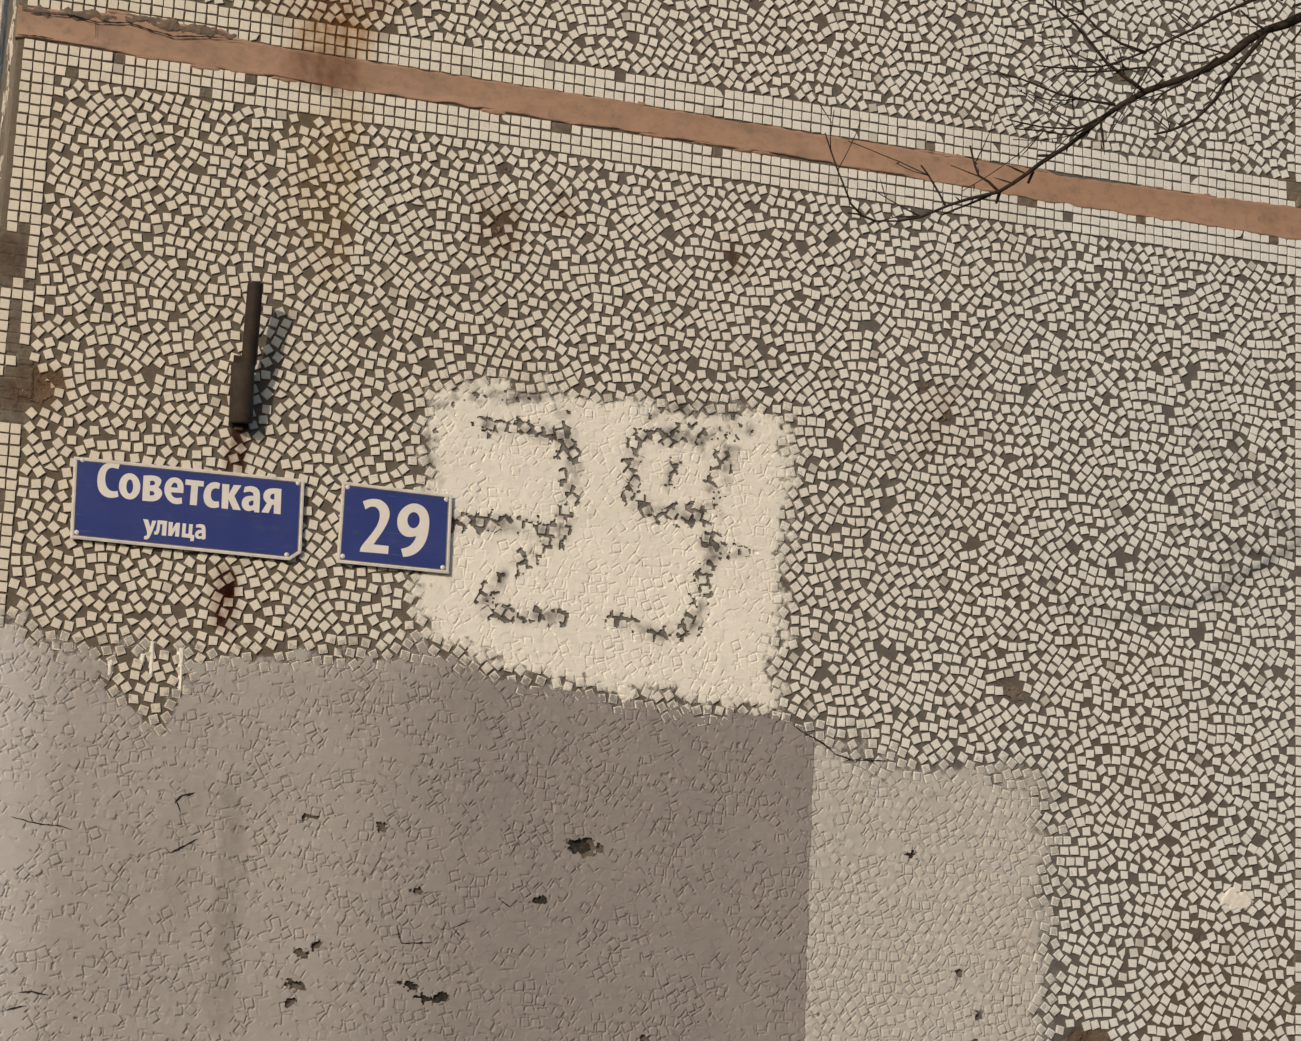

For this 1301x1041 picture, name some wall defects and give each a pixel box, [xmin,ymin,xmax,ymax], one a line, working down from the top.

spalling [12,370,66,405]
corrosion [231,429,245,465]
corrosion [215,570,234,628]
spalling [1062,1029,1110,1041]